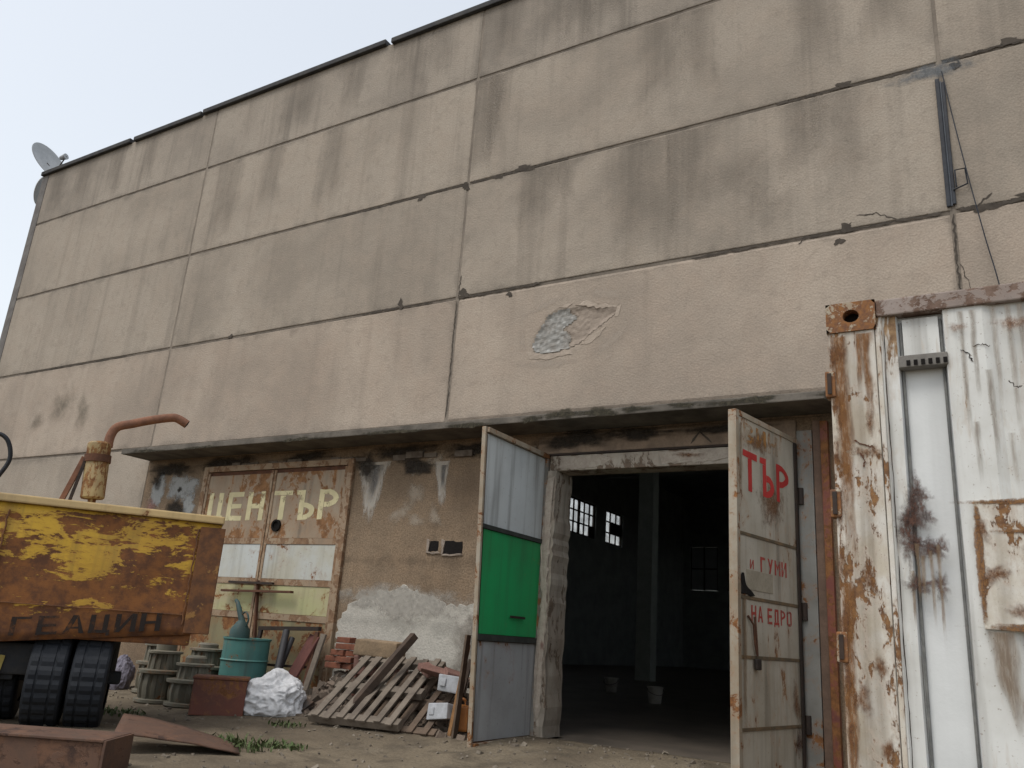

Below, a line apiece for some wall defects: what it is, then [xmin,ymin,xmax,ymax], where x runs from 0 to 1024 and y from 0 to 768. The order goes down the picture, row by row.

crack [691,192,1024,290]
spalling [520,290,623,367]
corrosion [829,333,879,521]
water stain [360,461,391,516]
water stain [392,455,449,524]
peeling [332,584,474,693]
corrosion [838,550,870,768]
corrosion [898,477,948,622]
corrosion [960,498,1024,708]